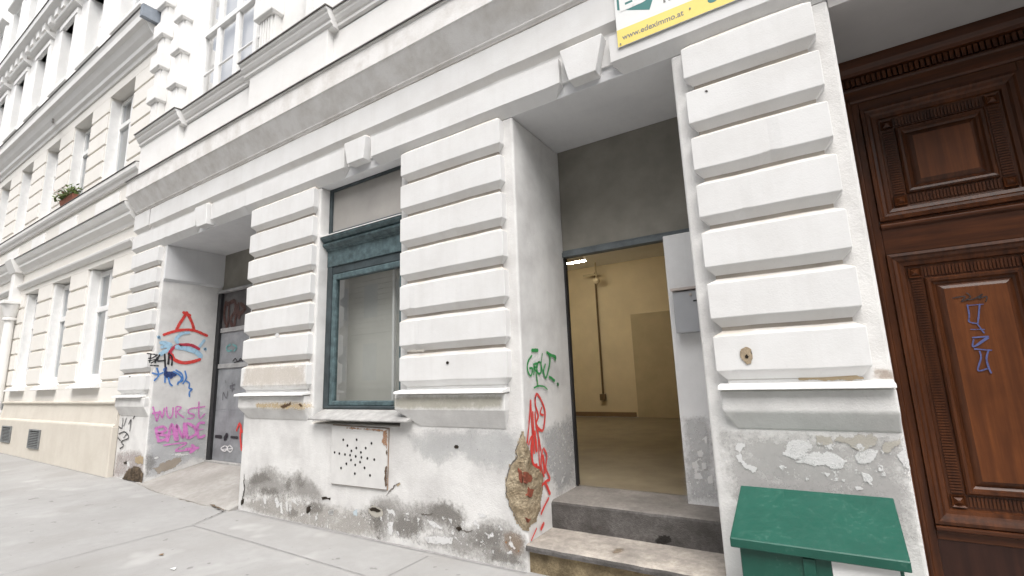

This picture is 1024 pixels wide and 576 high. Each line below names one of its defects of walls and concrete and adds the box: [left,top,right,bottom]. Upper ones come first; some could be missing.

spalling [740,347,753,365]
spalling [122,449,200,483]
spalling [505,431,573,531]
peeling [724,442,757,473]
peeling [779,433,910,491]
water stain [371,501,524,564]